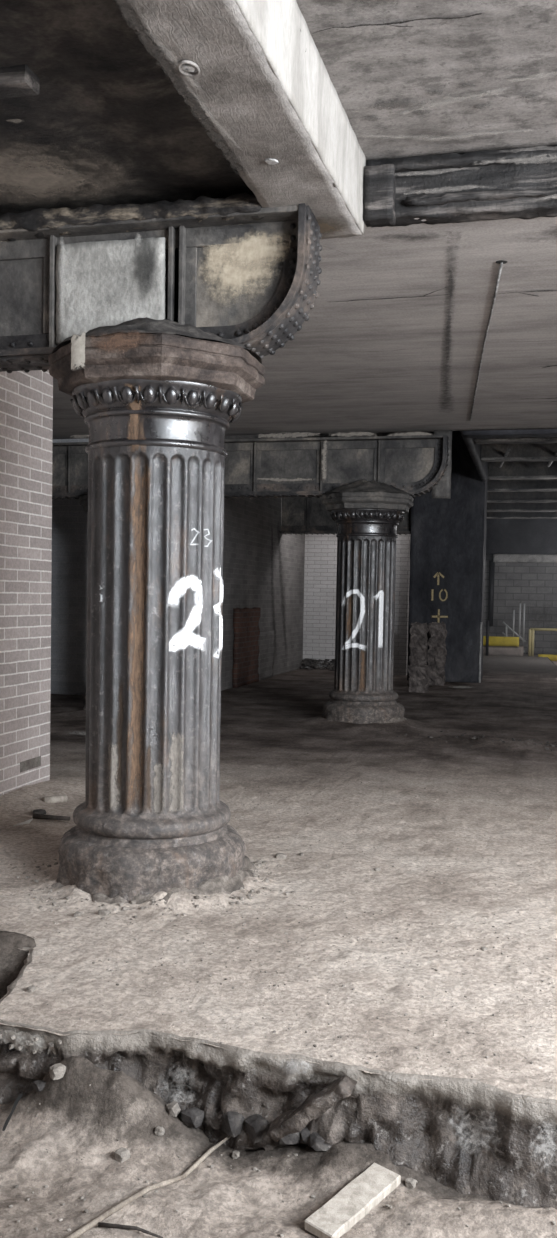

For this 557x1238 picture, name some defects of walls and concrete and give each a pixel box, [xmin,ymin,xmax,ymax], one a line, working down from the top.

corrosion [115,384,151,809]
spalling [0,1019,557,1209]